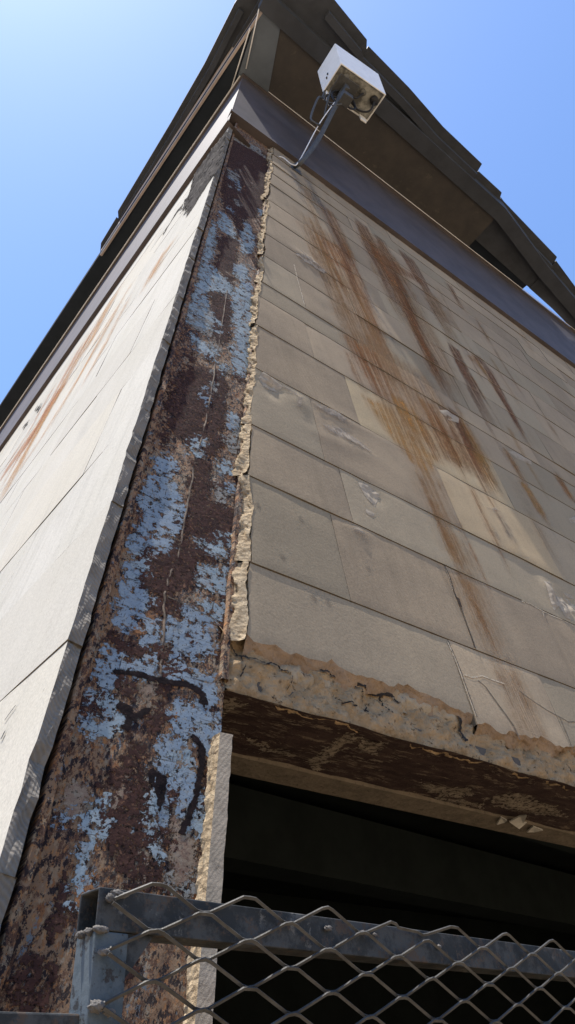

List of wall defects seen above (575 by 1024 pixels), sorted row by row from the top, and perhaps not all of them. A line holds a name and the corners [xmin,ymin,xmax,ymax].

corrosion [2,137,268,1013]
spalling [76,129,575,898]
corrosion [312,205,494,483]
corrosion [450,347,519,427]
crack [444,566,575,752]
peeling [50,792,118,913]